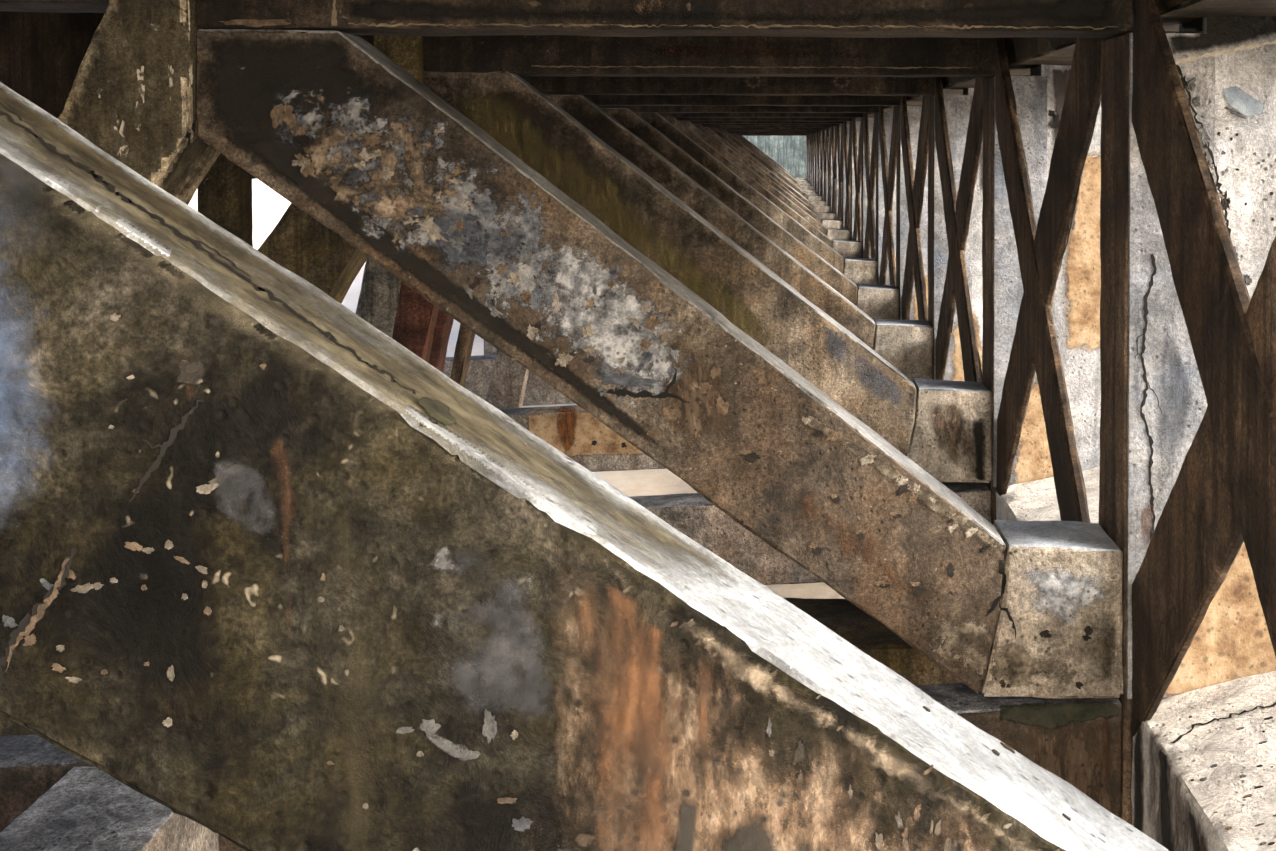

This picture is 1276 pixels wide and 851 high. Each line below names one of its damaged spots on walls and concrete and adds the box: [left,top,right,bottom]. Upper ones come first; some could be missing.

peeling [270,87,729,444]
peeling [196,462,275,533]
corrosion [605,591,667,851]
crack [986,550,1016,639]
crack [1135,254,1162,541]
crack [1170,702,1276,845]